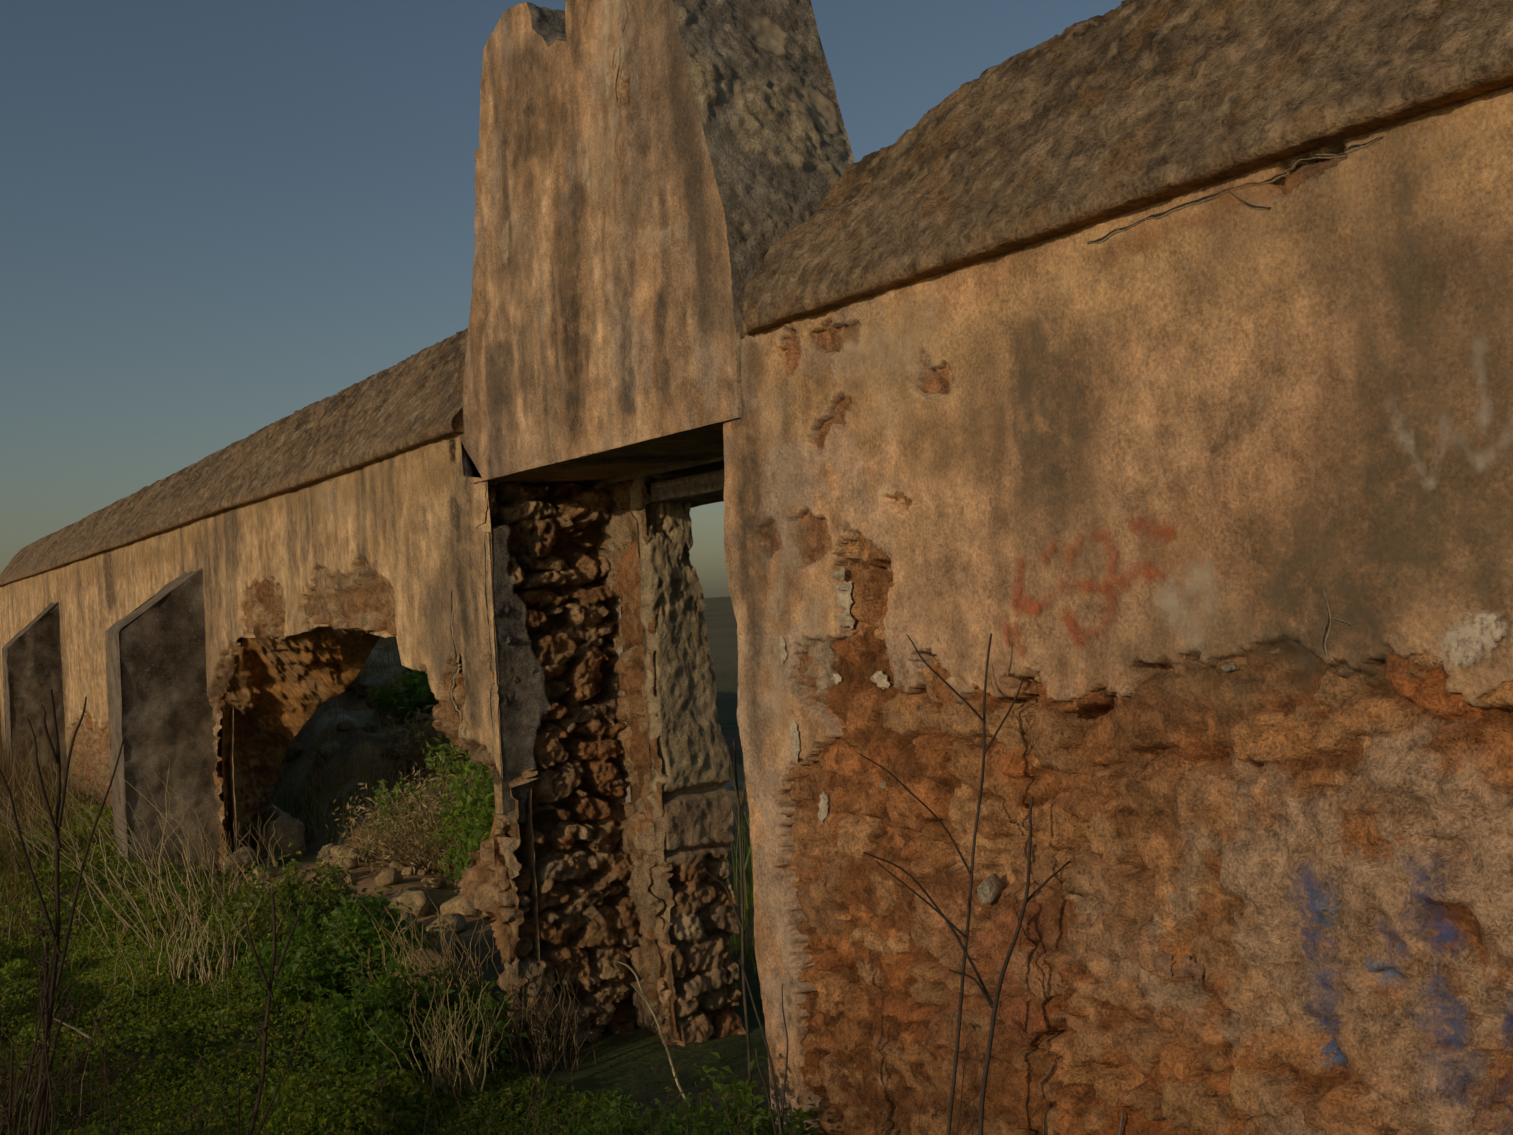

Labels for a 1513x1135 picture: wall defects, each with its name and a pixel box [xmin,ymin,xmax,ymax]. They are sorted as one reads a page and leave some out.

crack [1086,136,1384,244]
spalling [781,323,861,374]
spalling [920,353,955,394]
spalling [816,396,853,450]
spalling [761,521,783,557]
spalling [209,558,397,871]
spalling [778,535,1513,1135]